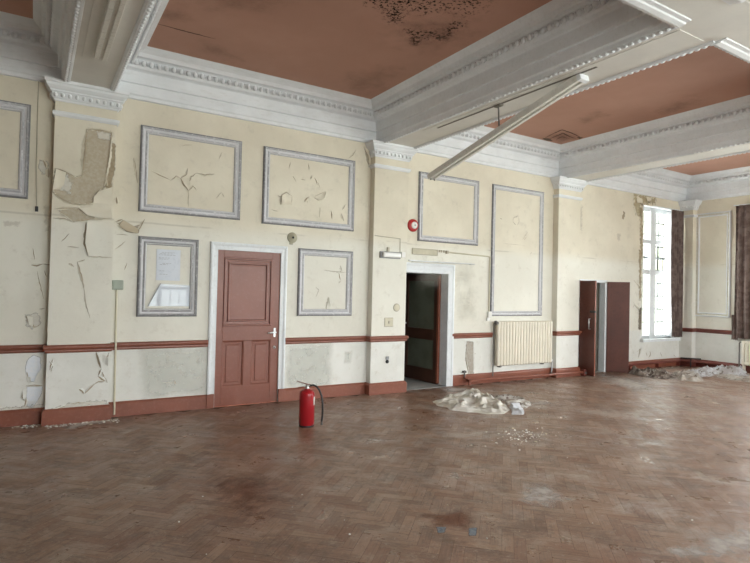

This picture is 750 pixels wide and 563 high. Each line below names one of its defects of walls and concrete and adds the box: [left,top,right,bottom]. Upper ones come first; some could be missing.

damp [366,0,481,22]
peeling [39,128,145,258]
crack [133,153,222,206]
peeling [634,194,656,216]
crack [61,234,90,317]
flaking render [1,355,43,411]
peeling [52,352,109,409]
flaking render [465,341,474,374]